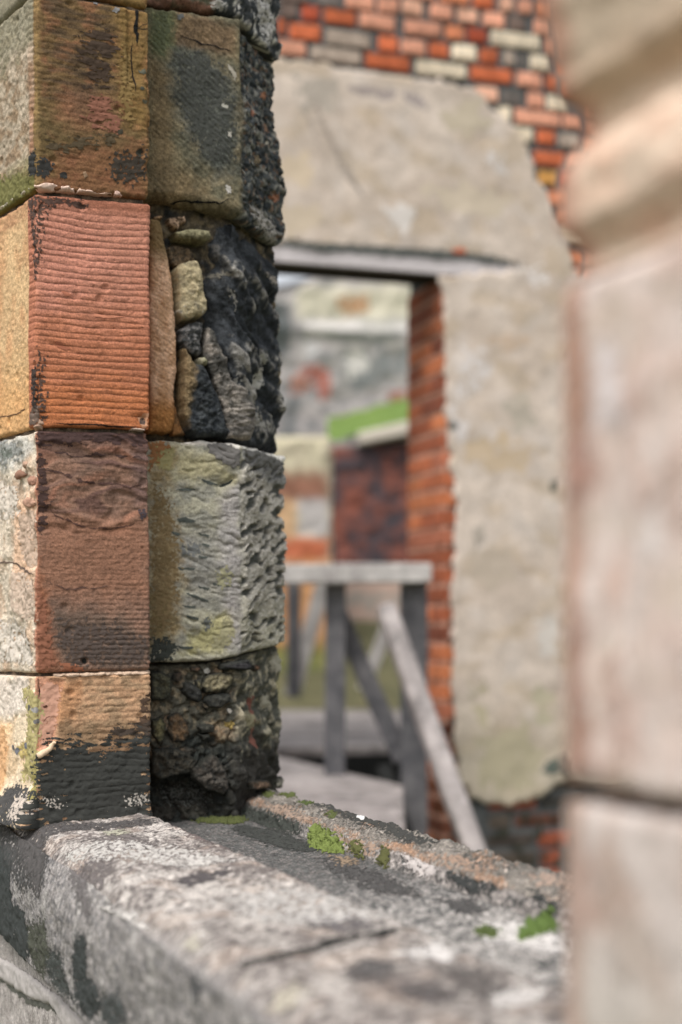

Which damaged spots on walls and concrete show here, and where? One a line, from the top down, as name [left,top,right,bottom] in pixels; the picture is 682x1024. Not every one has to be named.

damp [73,24,123,92]
crack [131,10,148,90]
damp [165,46,241,170]
damp [28,129,148,189]
crack [170,197,231,205]
damp [53,614,179,671]
damp [0,692,164,1024]
crack [239,926,408,968]